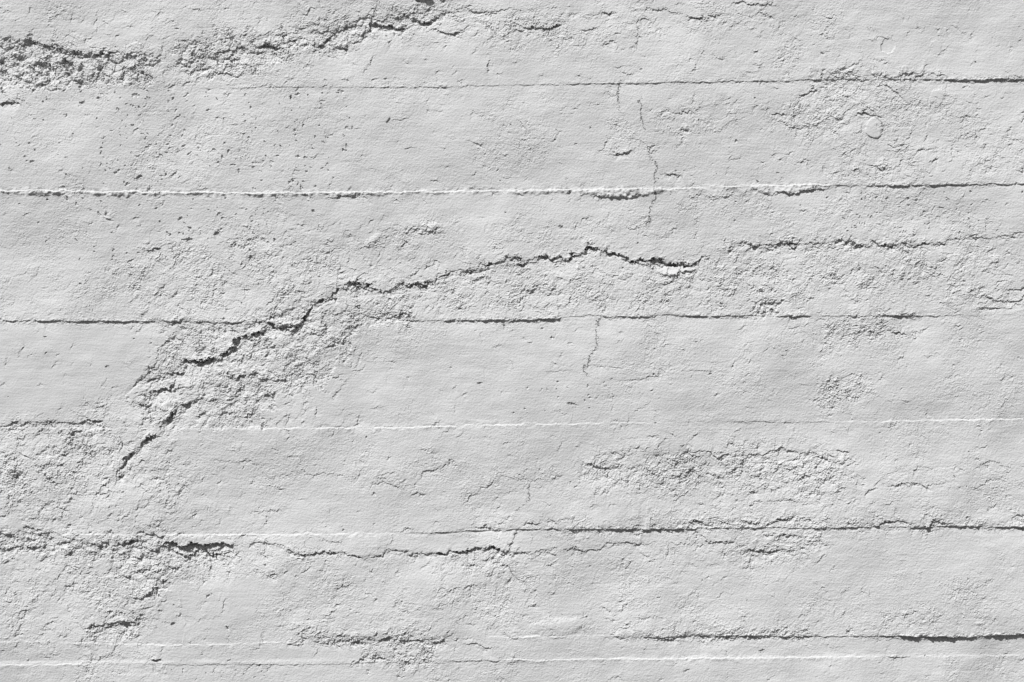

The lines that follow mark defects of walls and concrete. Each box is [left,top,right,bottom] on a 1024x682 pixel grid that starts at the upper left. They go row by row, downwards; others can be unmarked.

spalling [0,0,617,107]
crack [5,231,1024,513]